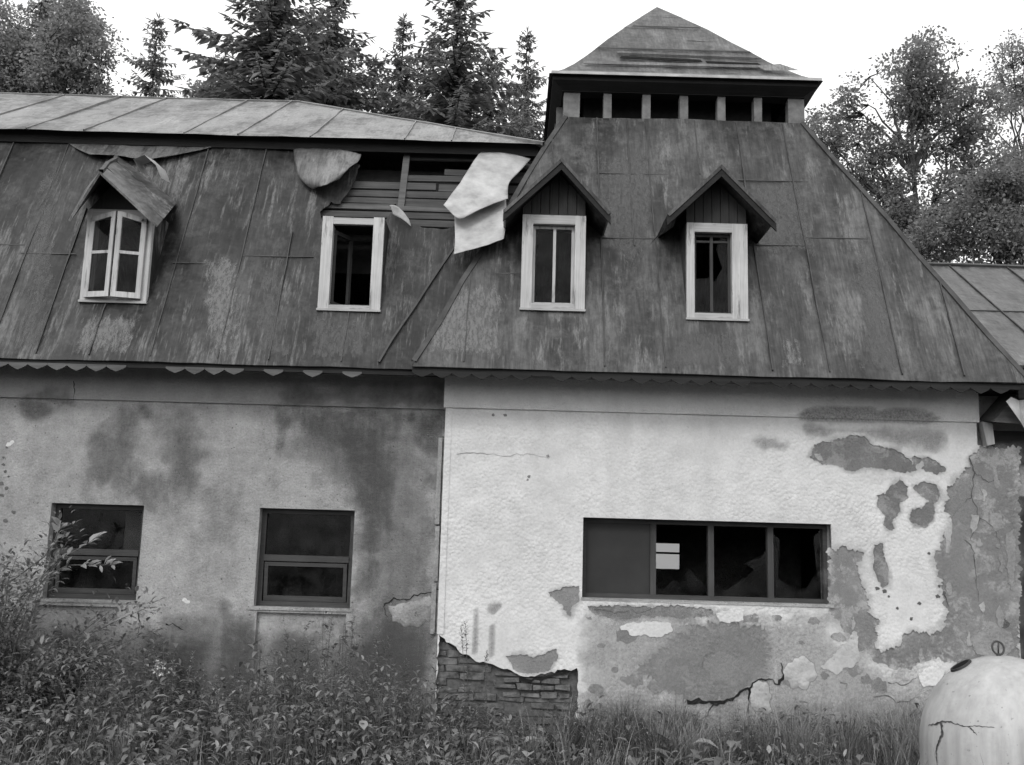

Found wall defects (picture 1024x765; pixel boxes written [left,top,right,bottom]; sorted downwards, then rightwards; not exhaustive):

spalling [810,435,1023,693]
flaking render [433,635,603,734]
spalling [548,586,784,705]
crack [687,663,784,712]